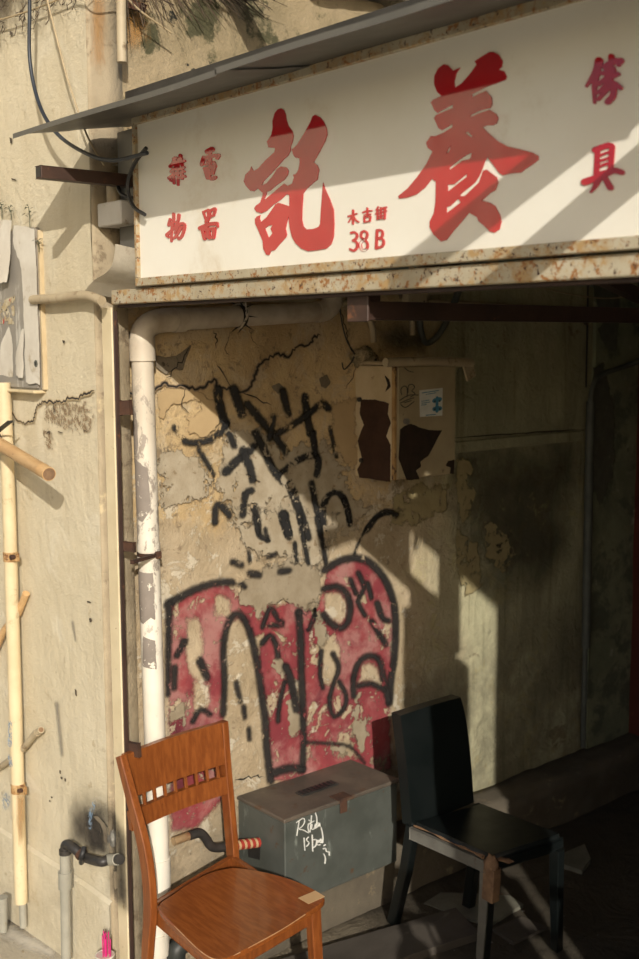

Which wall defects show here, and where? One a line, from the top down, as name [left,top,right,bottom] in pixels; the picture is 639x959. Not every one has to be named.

crack [12,390,94,426]
crack [155,331,320,413]
peeling [389,457,517,597]